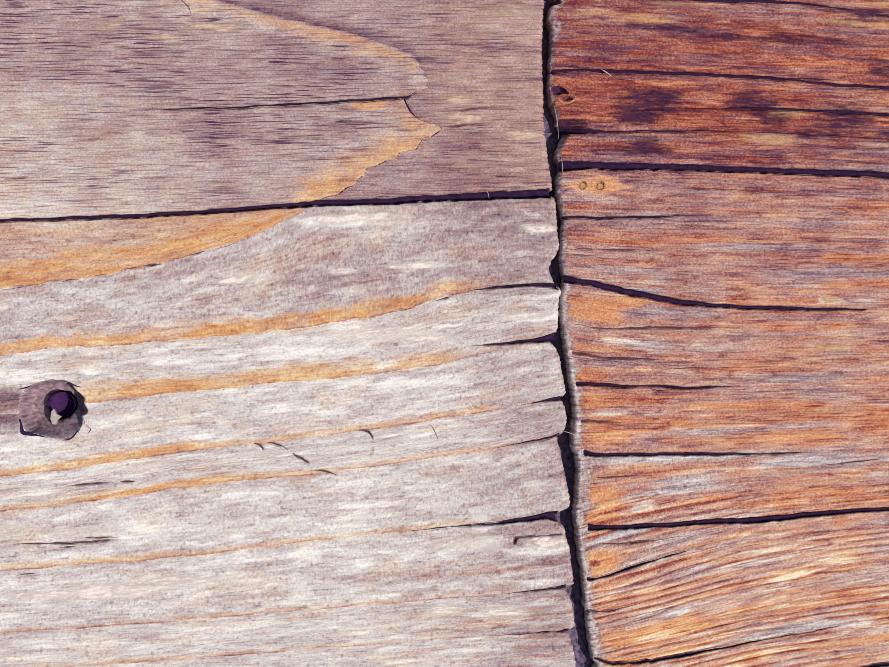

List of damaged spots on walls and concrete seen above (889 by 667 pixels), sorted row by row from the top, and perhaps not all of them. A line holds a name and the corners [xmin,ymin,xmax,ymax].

crack [807,42,889,61]
crack [551,69,889,89]
crack [159,93,417,117]
crack [0,107,889,222]
crack [563,276,878,329]
crack [862,659,889,667]